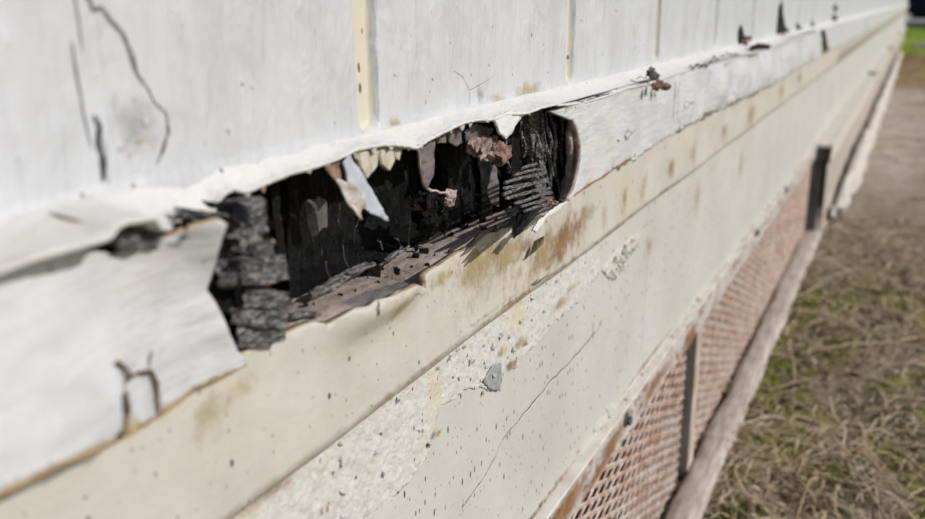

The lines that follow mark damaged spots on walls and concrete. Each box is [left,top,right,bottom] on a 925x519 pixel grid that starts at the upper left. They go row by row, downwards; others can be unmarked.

crack [72,0,171,164]
spalling [84,244,118,254]
spalling [243,186,266,199]
spalling [297,119,504,270]
spalling [491,163,537,207]
peeling [531,107,570,233]
rust [574,159,631,197]
spalling [233,232,640,519]
crack [461,321,603,509]